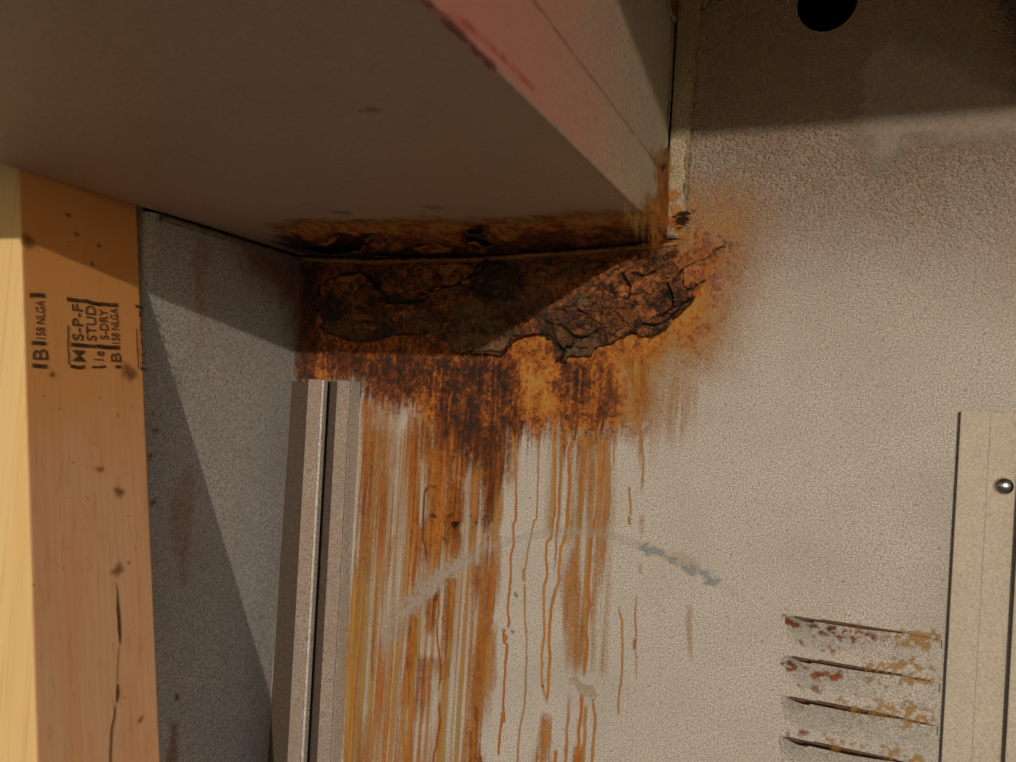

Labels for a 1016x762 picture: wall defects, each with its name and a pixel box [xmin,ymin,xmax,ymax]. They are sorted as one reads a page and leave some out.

rust [273,149,742,762]
rust [783,615,941,653]
rust [781,658,843,693]
rust [866,659,934,685]
rust [838,698,935,729]